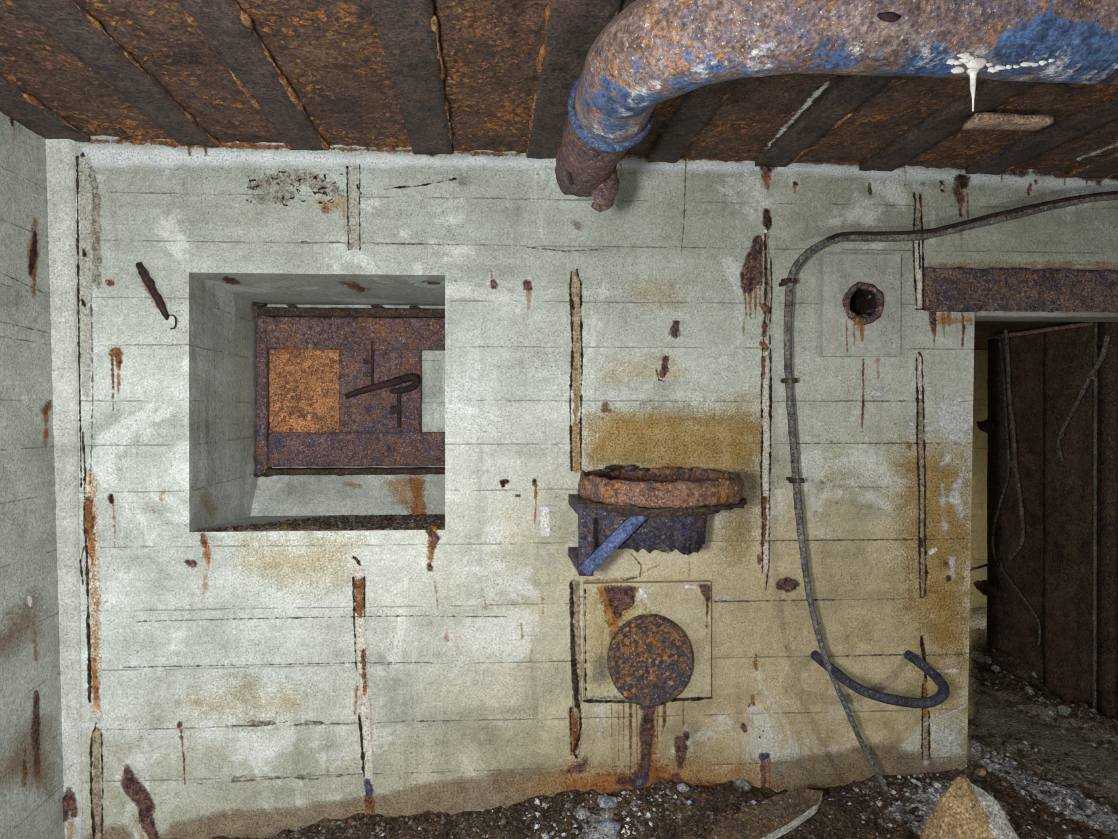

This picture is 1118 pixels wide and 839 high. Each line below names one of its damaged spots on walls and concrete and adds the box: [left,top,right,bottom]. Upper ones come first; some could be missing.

corrosion [234,0,413,153]
corrosion [2,79,291,157]
spalling [246,171,344,206]
corrosion [27,219,38,296]
corrosion [740,208,772,333]
corrosion [109,348,123,410]
corrosion [84,498,94,541]
damp [905,395,970,673]
corrosion [22,690,40,787]
corrosion [611,703,666,789]
corrosion [672,707,689,783]
corrosion [121,765,159,839]